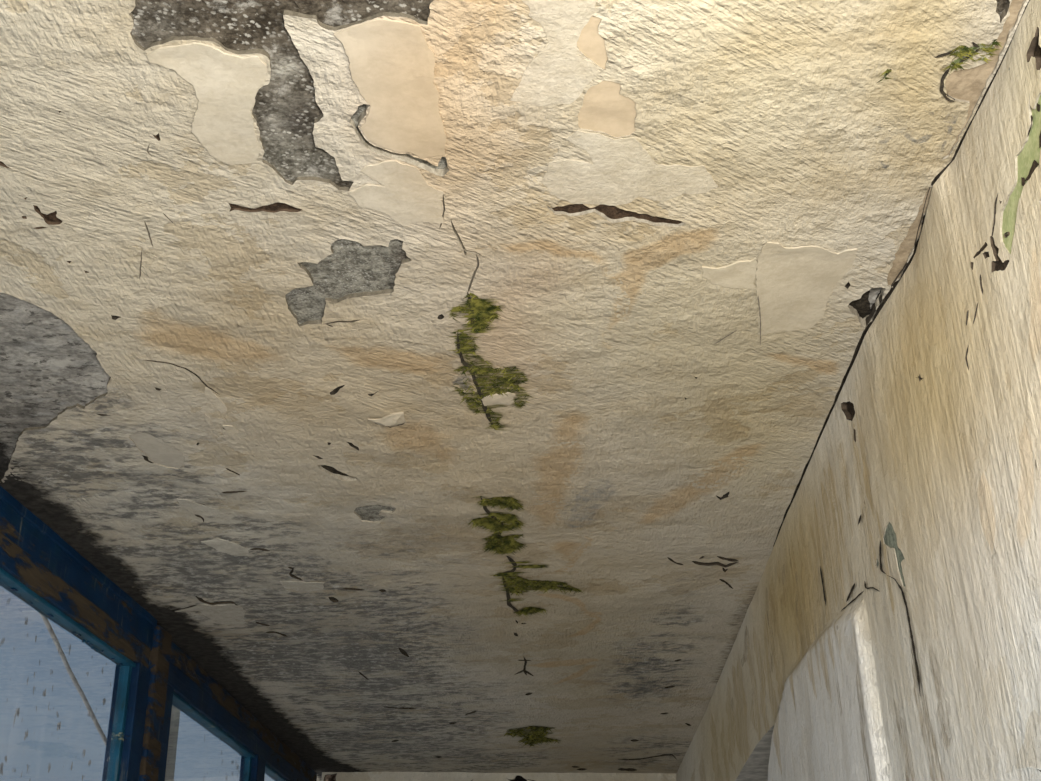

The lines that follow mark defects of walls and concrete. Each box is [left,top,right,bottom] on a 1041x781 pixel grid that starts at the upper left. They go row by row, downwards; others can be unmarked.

spalling [129,0,449,226]
flaking render [510,0,718,227]
spalling [22,197,62,229]
spalling [285,239,411,327]
crack [439,196,482,292]
spalling [971,232,1010,272]
peeling [1021,160,1039,186]
water stain [120,290,464,385]
flaking render [0,293,111,480]
water stain [359,410,477,470]
water stain [0,443,499,781]
crack [820,541,920,692]